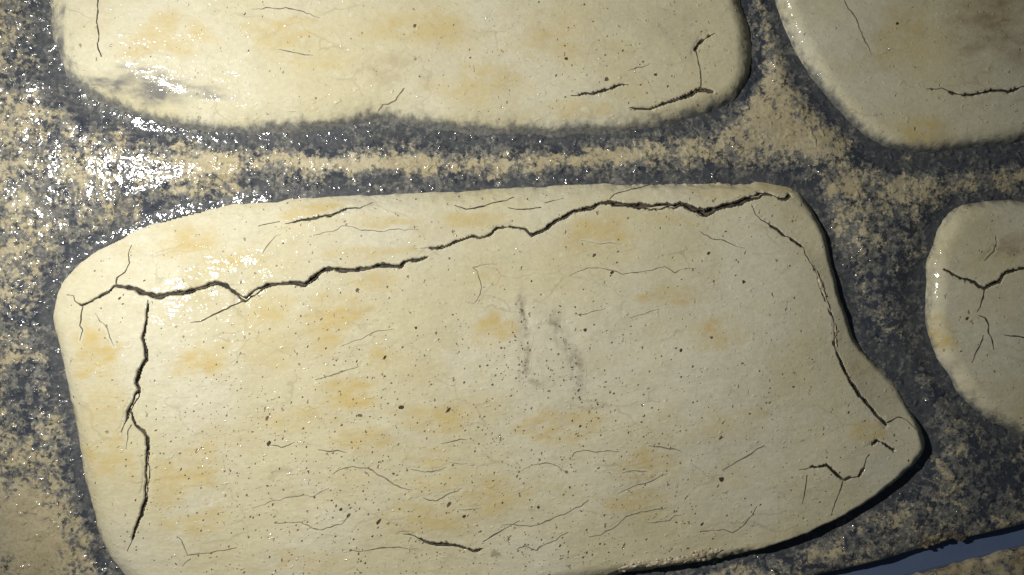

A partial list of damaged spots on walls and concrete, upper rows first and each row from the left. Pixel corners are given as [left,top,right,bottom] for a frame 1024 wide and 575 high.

crack [571,33,715,110]
crack [928,86,1024,96]
crack [942,236,1024,363]
crack [67,184,912,552]